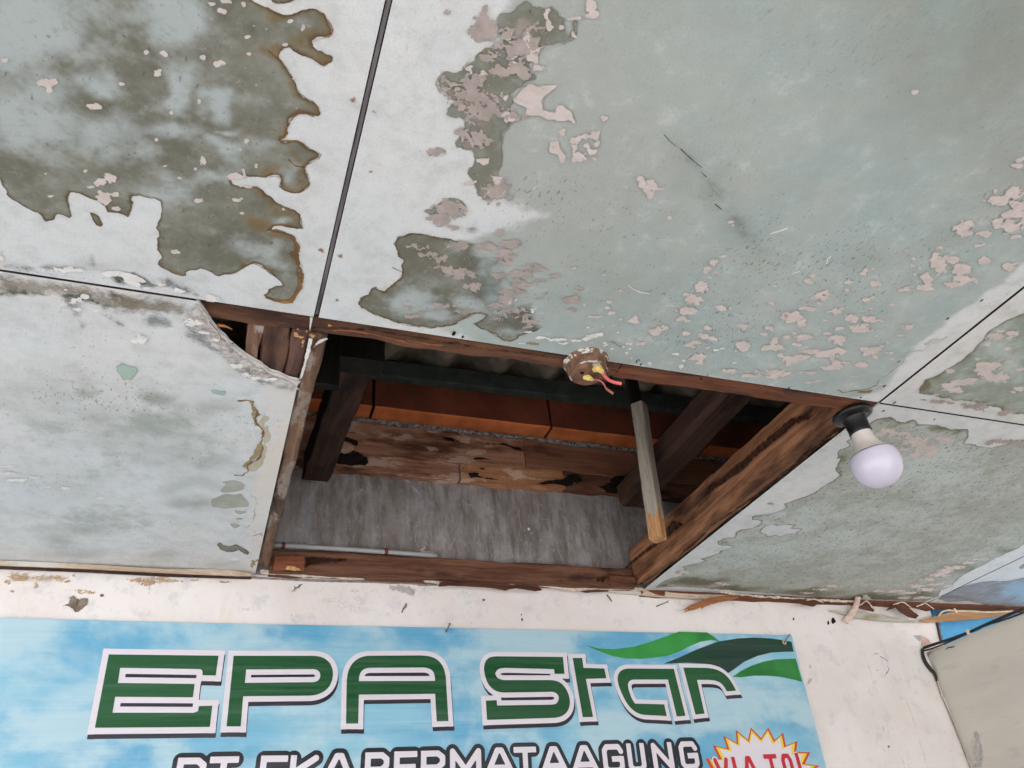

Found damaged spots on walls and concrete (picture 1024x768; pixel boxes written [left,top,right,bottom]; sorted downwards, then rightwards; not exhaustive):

peeling [440,0,608,206]
water stain [0,0,333,325]
peeling [419,147,446,157]
peeling [624,176,664,199]
peeling [401,180,1024,384]
spalling [101,271,301,390]
peeling [921,330,1024,416]
peeling [875,427,959,458]
peeling [983,439,1024,449]
water stain [212,481,255,528]
water stain [217,543,249,555]
peeling [869,558,990,600]